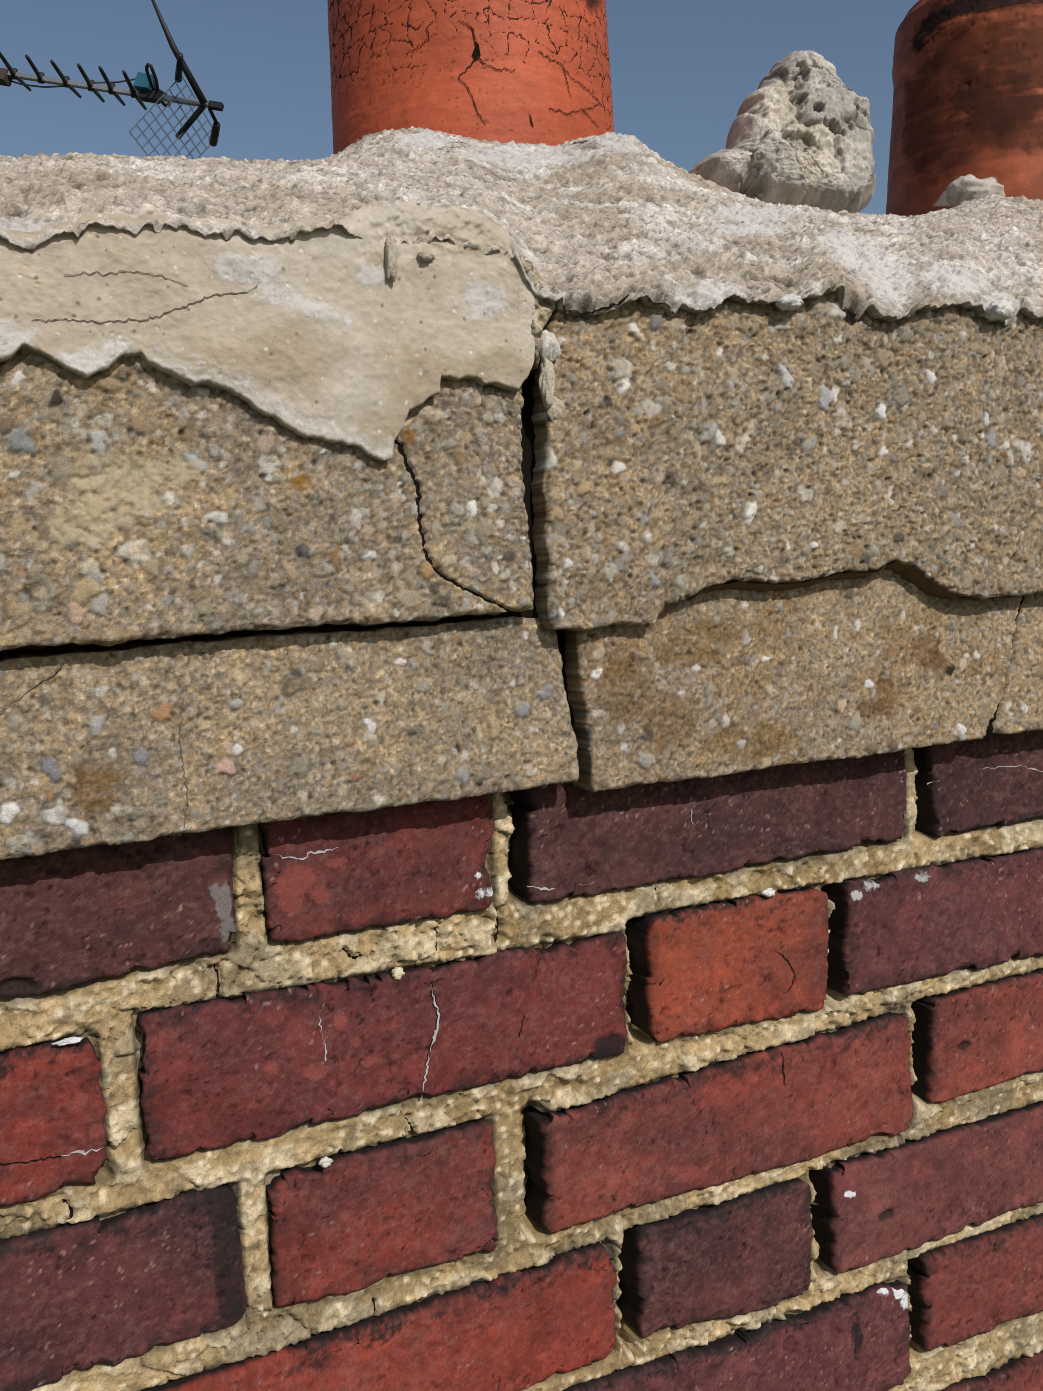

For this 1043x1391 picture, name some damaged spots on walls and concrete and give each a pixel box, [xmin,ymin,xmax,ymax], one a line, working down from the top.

crack [329,0,614,133]
peeling [0,200,535,461]
crack [395,369,579,766]
crack [0,668,61,715]
crack [984,596,1043,772]
crack [405,927,441,1132]